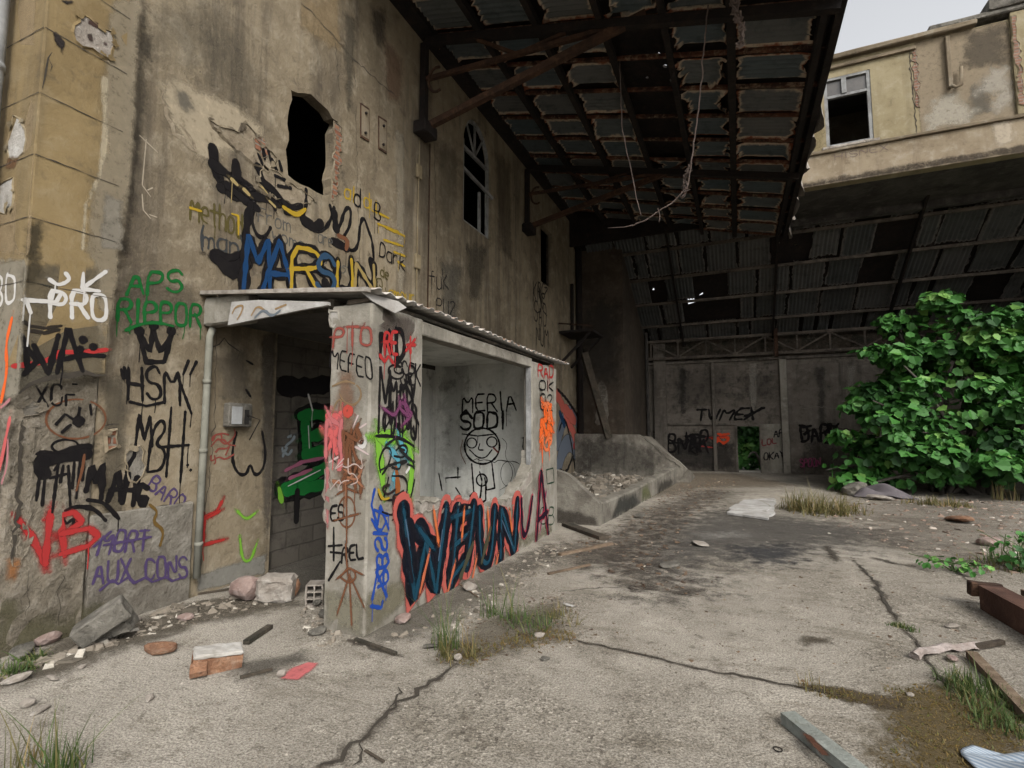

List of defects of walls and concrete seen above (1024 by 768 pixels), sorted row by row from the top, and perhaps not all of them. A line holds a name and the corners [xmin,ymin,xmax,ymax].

peeling [3,115,26,160]
flaking render [71,8,119,61]
leakage [130,15,149,168]
peeling [159,79,343,205]
flaking render [911,15,1024,144]
leakage [964,25,1010,67]
peeling [0,177,15,215]
crack [316,663,457,768]